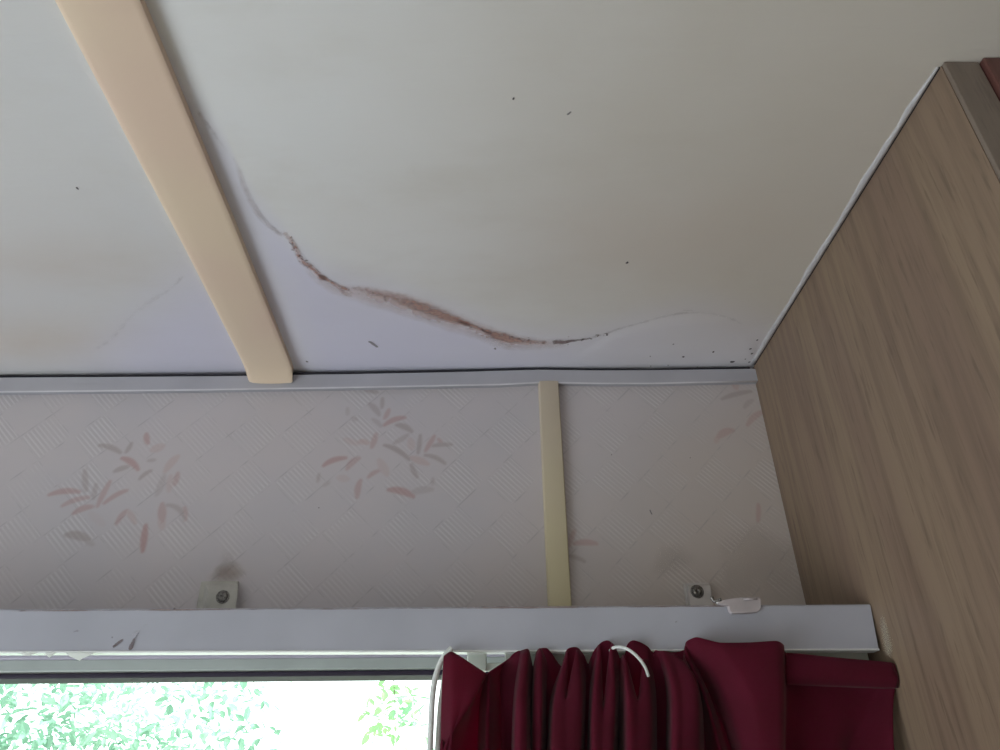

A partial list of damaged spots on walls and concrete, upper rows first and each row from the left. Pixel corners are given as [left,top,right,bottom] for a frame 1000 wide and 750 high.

damp [395,298,608,344]